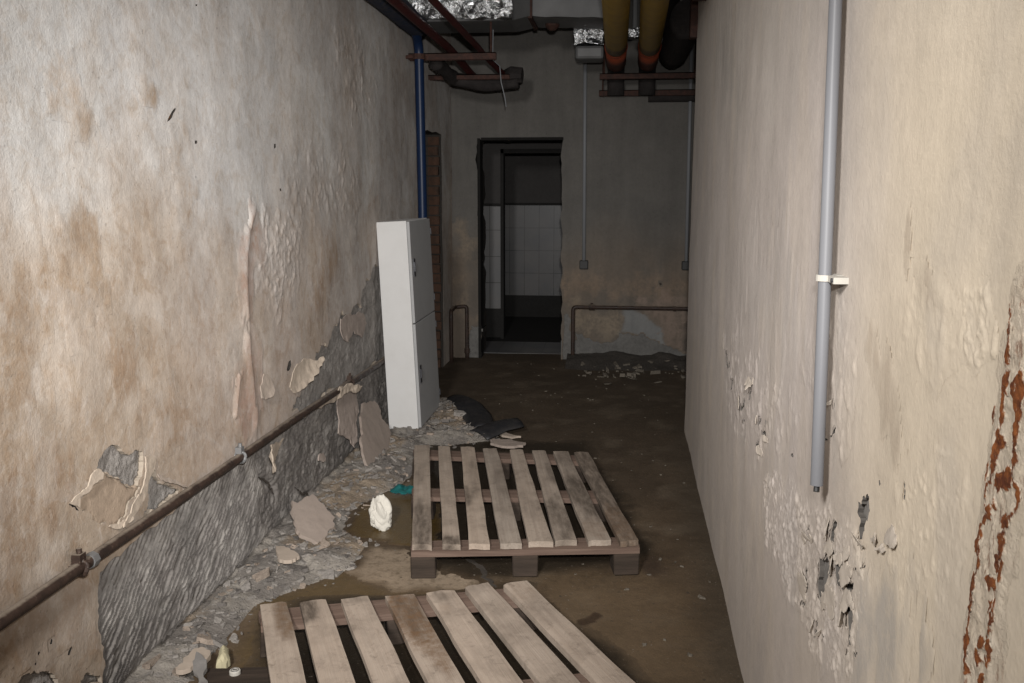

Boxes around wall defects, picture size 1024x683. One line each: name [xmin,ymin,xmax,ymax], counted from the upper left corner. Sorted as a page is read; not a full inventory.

leakage [41,44,100,149]
leakage [138,68,160,114]
leakage [164,109,202,234]
leakage [0,193,201,679]
flaking render [69,265,388,683]
flaking render [561,310,687,359]
peeling [755,415,876,683]
corrosion [959,260,1024,683]